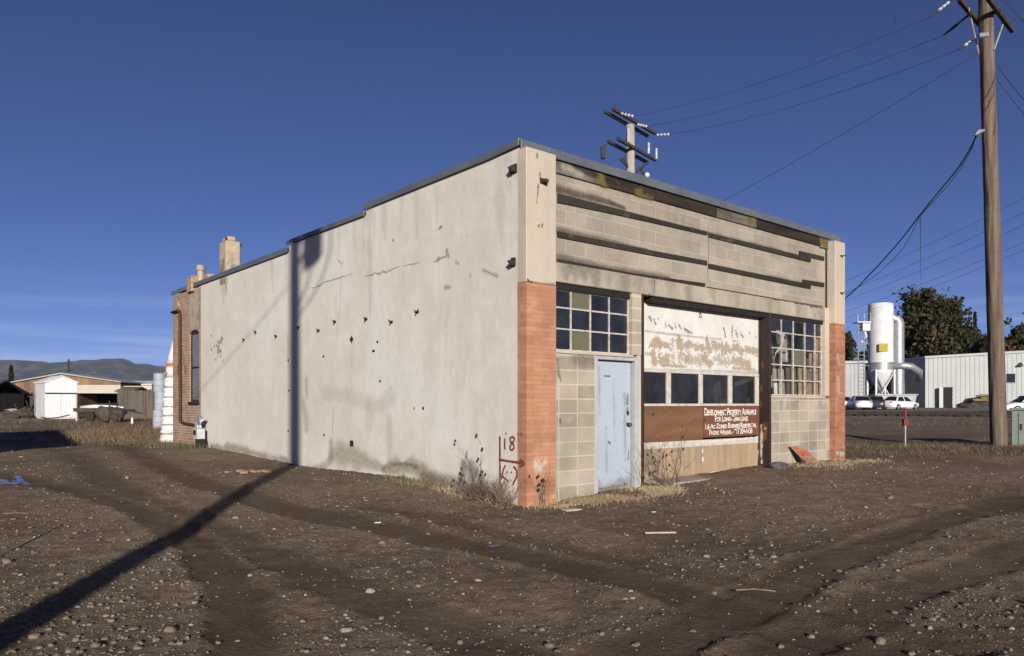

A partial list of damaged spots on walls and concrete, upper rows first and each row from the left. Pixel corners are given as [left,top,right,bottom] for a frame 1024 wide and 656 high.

crack [311,254,448,338]
peeling [648,316,764,371]